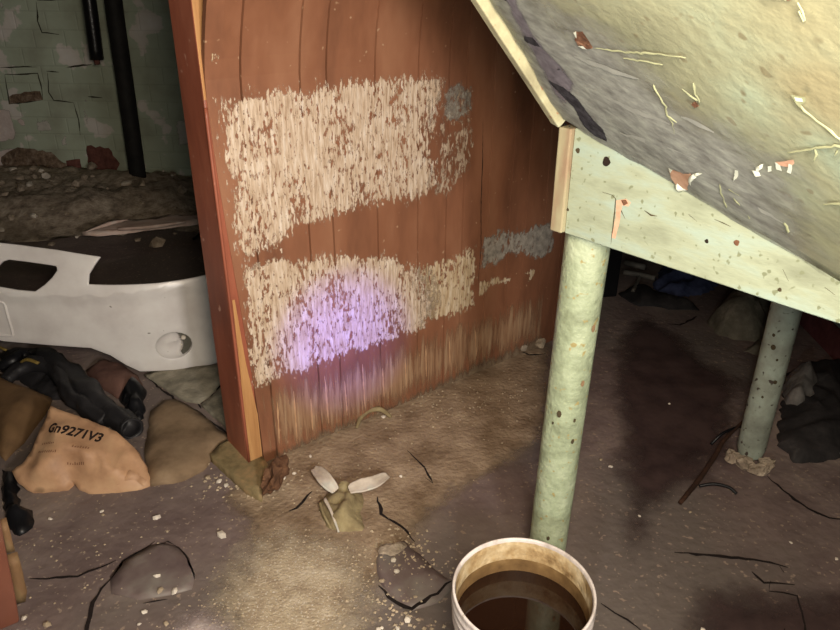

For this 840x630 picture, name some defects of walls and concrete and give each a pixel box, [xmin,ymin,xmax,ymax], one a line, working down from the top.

spalling [574,31,593,49]
spalling [0,91,120,170]
leakage [494,0,797,255]
crack [788,105,840,162]
peeling [669,169,702,192]
peeling [752,160,794,177]
peeling [213,69,554,447]
crack [377,497,415,542]
crack [30,541,195,630]
crack [378,580,452,610]
crack [675,552,807,630]